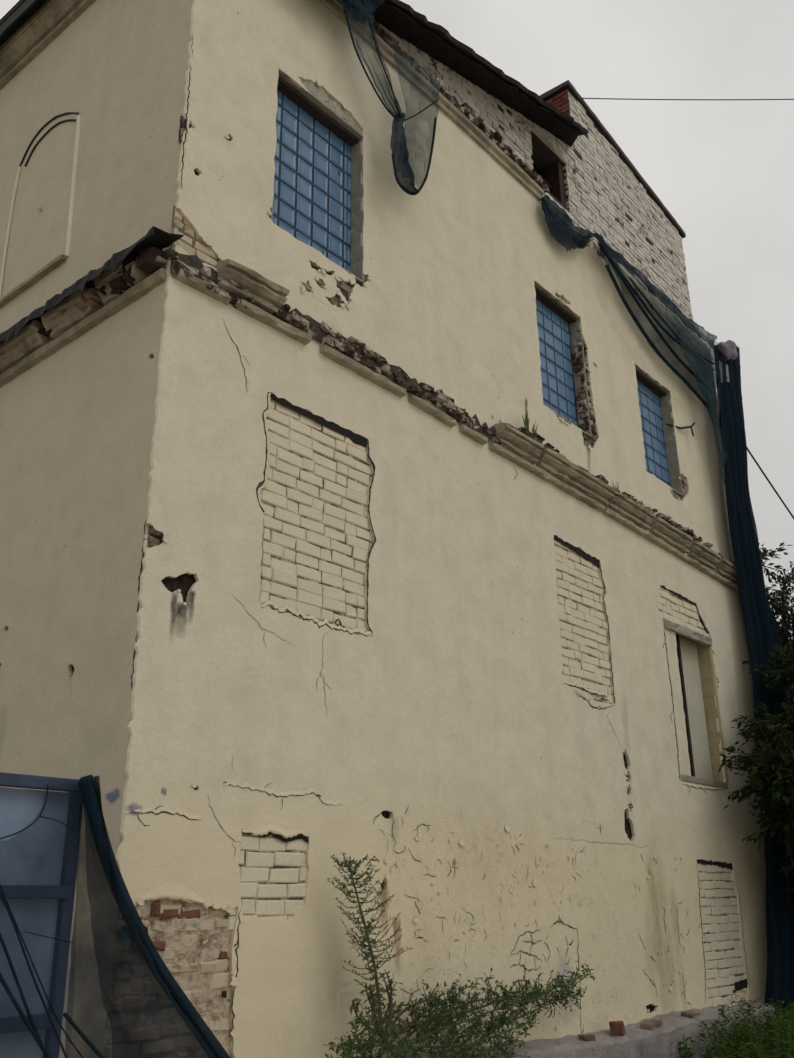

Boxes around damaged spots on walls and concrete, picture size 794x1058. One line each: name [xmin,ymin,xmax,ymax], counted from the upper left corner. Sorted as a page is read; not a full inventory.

crack [181,39,194,190]
flaking render [301,260,371,310]
flaking render [273,304,503,447]
flaking render [503,421,565,457]
crack [223,318,378,716]
hole [161,573,196,605]
crack [125,758,343,856]
flaking render [135,897,246,1058]
crack [366,806,707,1034]
spalling [735,979,748,992]